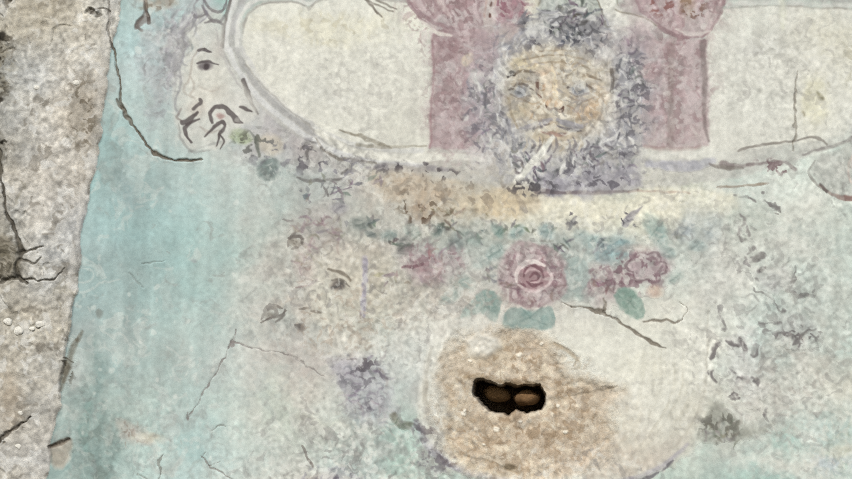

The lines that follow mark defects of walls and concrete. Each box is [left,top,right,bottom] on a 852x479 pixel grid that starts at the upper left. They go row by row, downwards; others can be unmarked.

crack [109,40,122,92]
crack [131,120,203,162]
crack [0,175,65,285]
crack [564,298,688,349]
crack [186,329,325,421]
spalling [425,321,629,479]
crack [137,455,163,479]
crack [201,452,231,479]